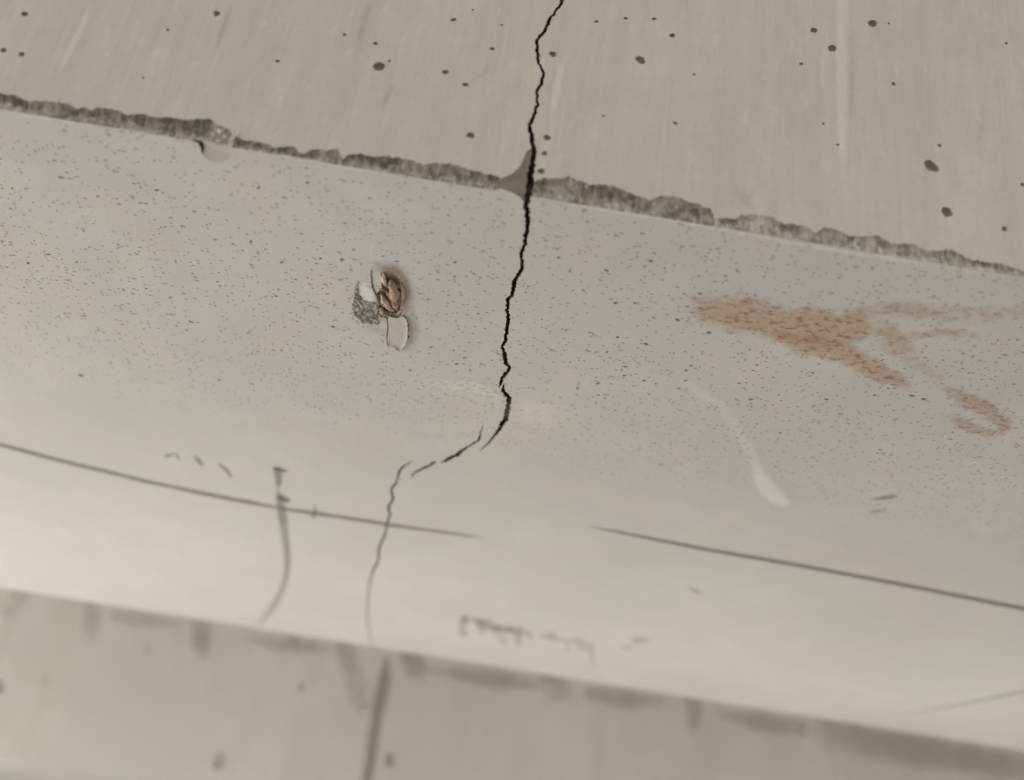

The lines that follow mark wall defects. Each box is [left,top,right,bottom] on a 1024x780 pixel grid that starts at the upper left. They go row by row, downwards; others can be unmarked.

spalling [0,93,502,191]
spalling [531,176,1024,277]
spalling [351,270,410,352]
rust [700,299,905,382]
crack [366,0,564,780]